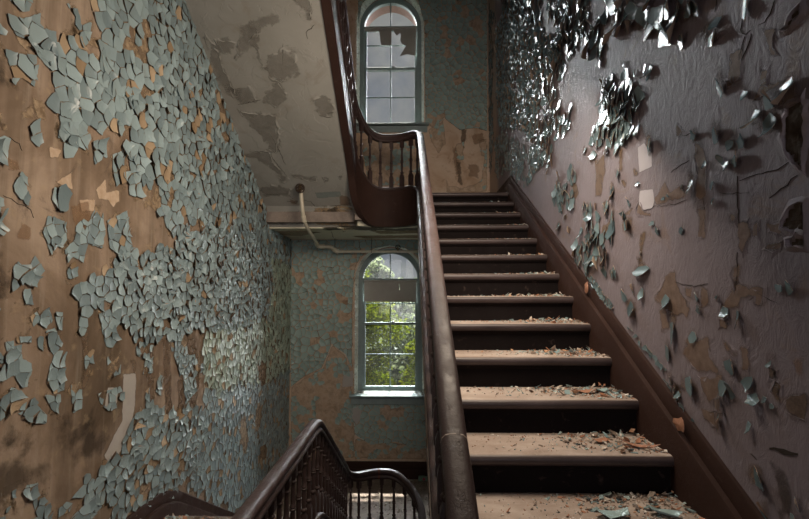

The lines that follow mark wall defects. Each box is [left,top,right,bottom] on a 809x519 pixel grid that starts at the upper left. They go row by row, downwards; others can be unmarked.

peeling [0,0,427,519]
peeling [418,0,809,310]
flaking render [621,251,809,432]